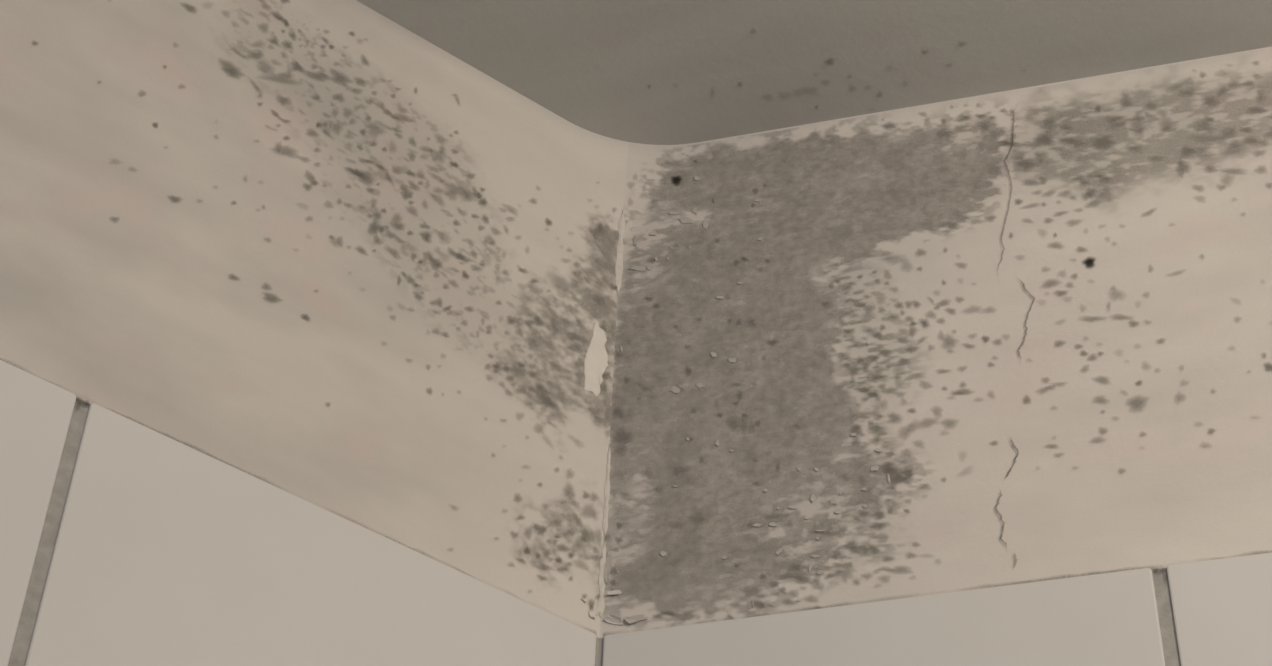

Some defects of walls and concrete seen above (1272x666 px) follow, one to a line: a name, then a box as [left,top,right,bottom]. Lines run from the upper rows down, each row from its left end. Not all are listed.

damp [1018,109,1160,186]
crack [1017,281,1035,356]
peeling [584,321,623,397]
damp [530,115,1007,620]
crack [995,440,1018,544]